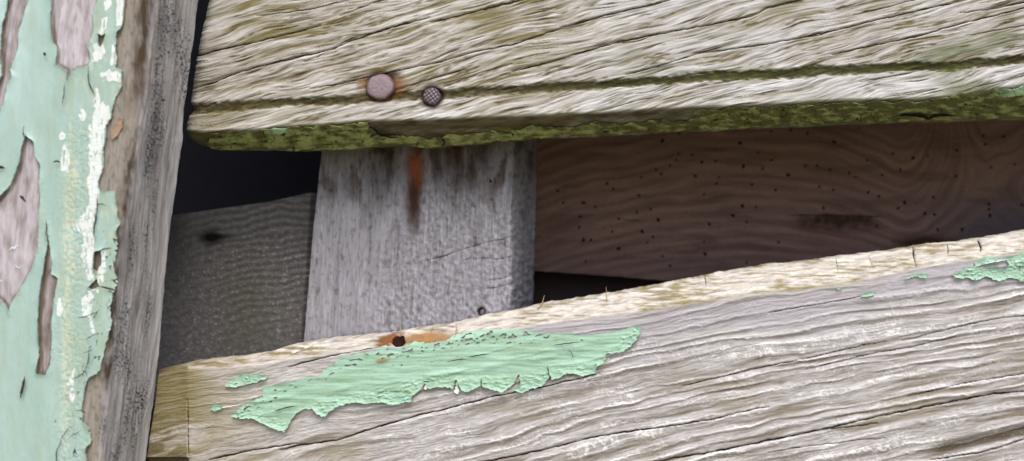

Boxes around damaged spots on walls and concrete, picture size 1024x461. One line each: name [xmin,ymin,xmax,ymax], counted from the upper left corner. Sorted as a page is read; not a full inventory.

peeling [0,0,28,109]
peeling [51,0,105,79]
corrosion [383,72,403,91]
corrosion [408,151,423,223]
peeling [0,136,58,375]
peeling [89,251,101,289]
corrosion [377,332,398,346]
peeling [210,326,641,432]
crack [774,296,860,312]
crack [688,315,1024,385]
peeling [952,253,1024,281]
crack [660,373,1024,461]